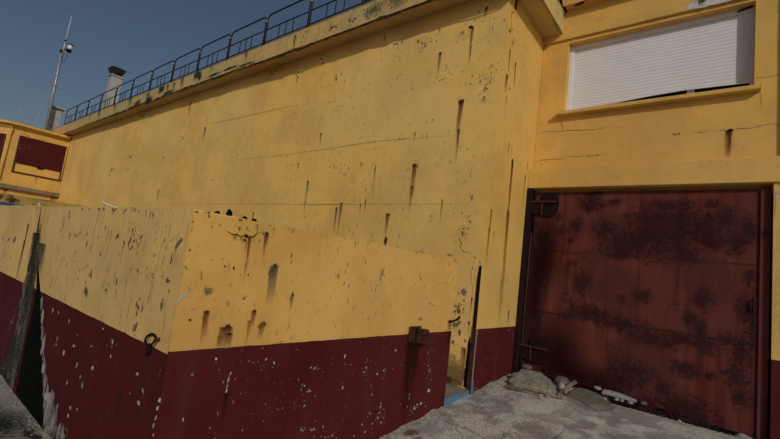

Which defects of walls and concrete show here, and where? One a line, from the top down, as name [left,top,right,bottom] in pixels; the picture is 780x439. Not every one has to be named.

spalling [686,0,731,10]
rust [218,324,232,341]
rust [602,359,728,432]